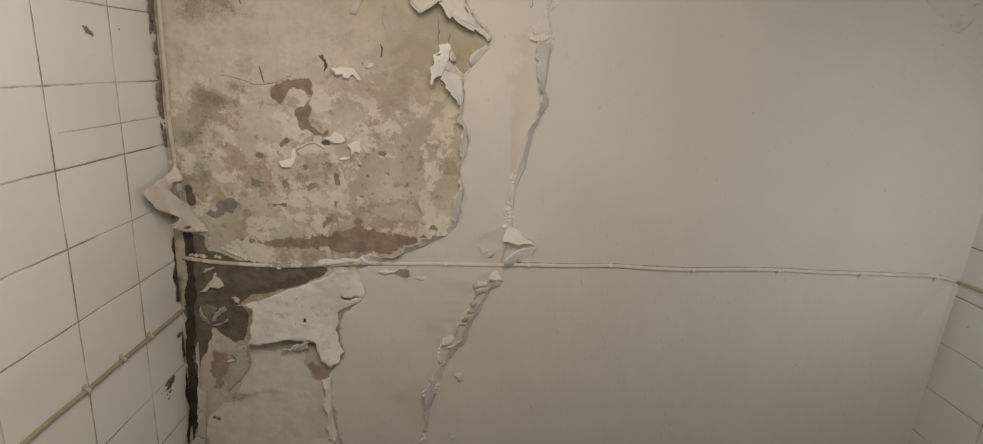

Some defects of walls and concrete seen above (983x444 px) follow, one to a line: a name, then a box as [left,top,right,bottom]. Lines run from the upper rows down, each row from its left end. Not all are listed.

leakage [270,78,329,136]
flaking render [144,0,559,444]